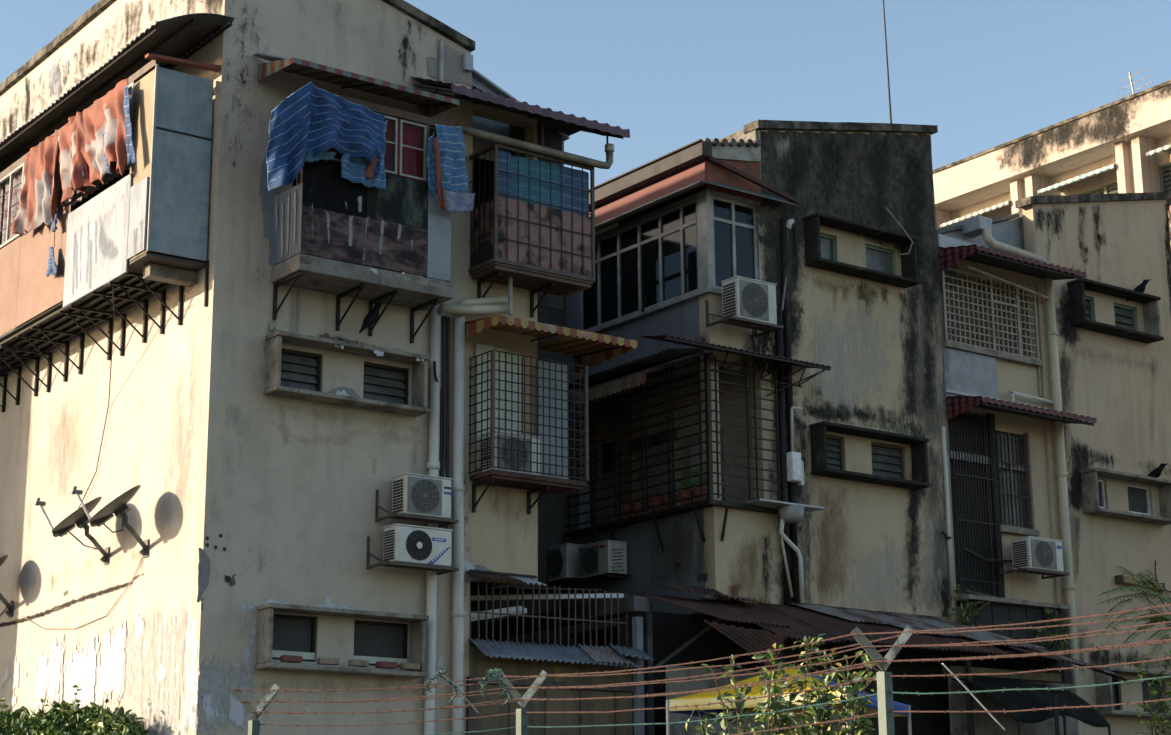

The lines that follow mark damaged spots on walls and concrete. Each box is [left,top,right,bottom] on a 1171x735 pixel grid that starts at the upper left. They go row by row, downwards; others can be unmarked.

leakage [3,77,40,138]
leakage [998,84,1171,172]
leakage [758,139,849,293]
leakage [796,283,910,475]
leakage [902,281,938,413]
leakage [1057,288,1086,541]
peeling [0,548,365,735]
leakage [941,579,951,620]
leakage [1079,630,1169,670]